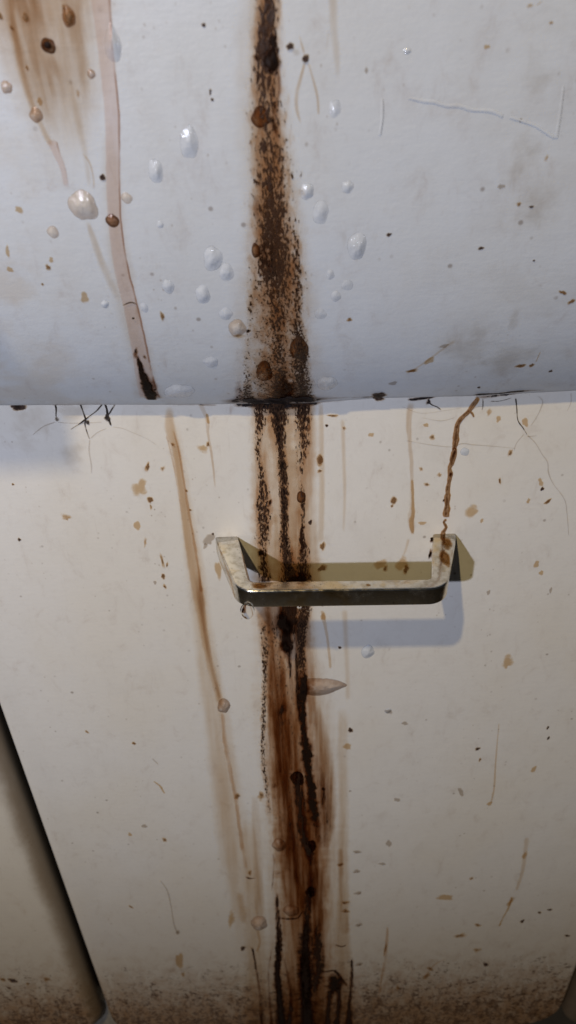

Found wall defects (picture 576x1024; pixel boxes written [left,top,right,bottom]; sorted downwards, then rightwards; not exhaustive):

crack [55,405,113,432]
rust [236,0,325,588]
rust [428,387,480,565]
rust [259,606,353,1024]